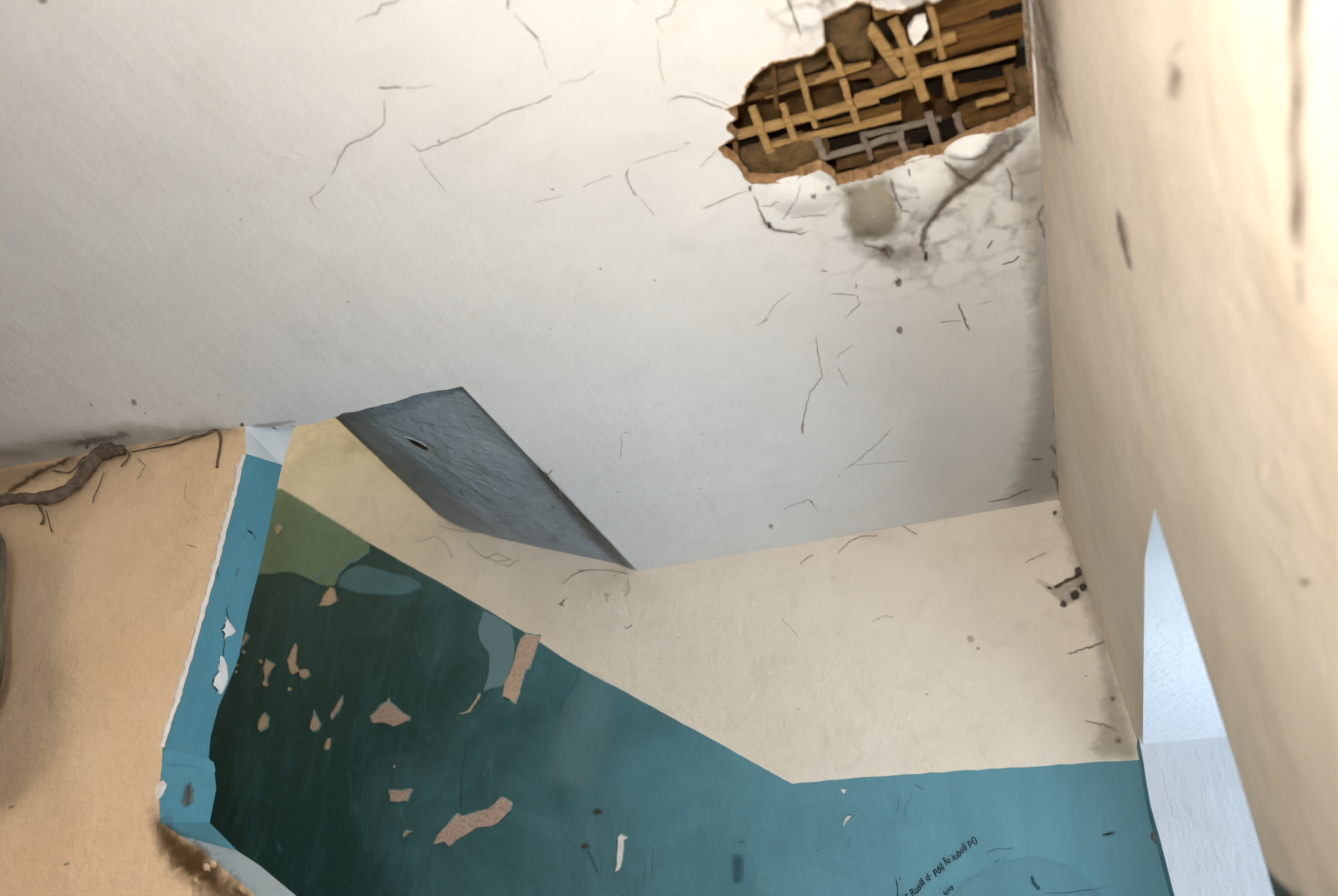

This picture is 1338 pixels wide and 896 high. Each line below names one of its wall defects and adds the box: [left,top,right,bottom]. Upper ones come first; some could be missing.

spalling [718,0,1036,186]
crack [333,87,401,172]
leakage [847,181,908,238]
peeling [458,611,541,715]
peeling [257,712,270,732]
peeling [310,695,344,750]
peeling [369,698,411,728]
peeling [389,788,414,803]
peeling [433,797,513,847]
leakage [161,831,245,896]
peeling [615,833,628,874]